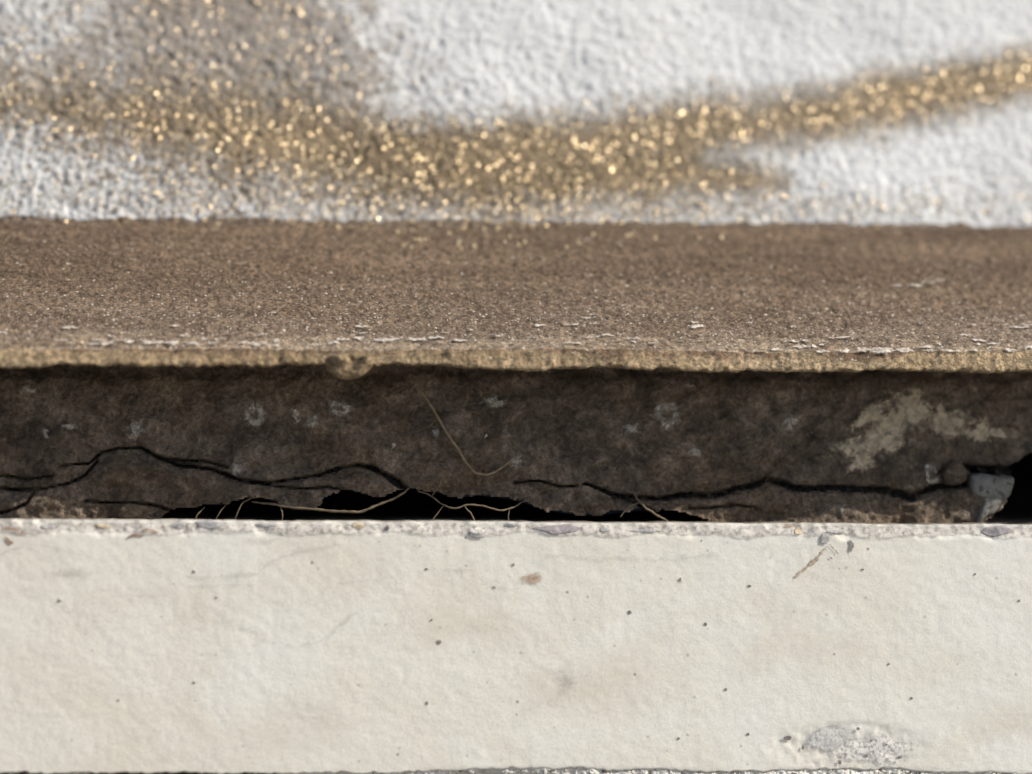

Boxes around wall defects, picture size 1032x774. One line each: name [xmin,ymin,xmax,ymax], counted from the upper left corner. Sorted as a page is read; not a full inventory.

crack [0,447,404,545]
crack [530,463,1013,514]
hole [969,453,1032,516]
spalling [367,727,1016,774]